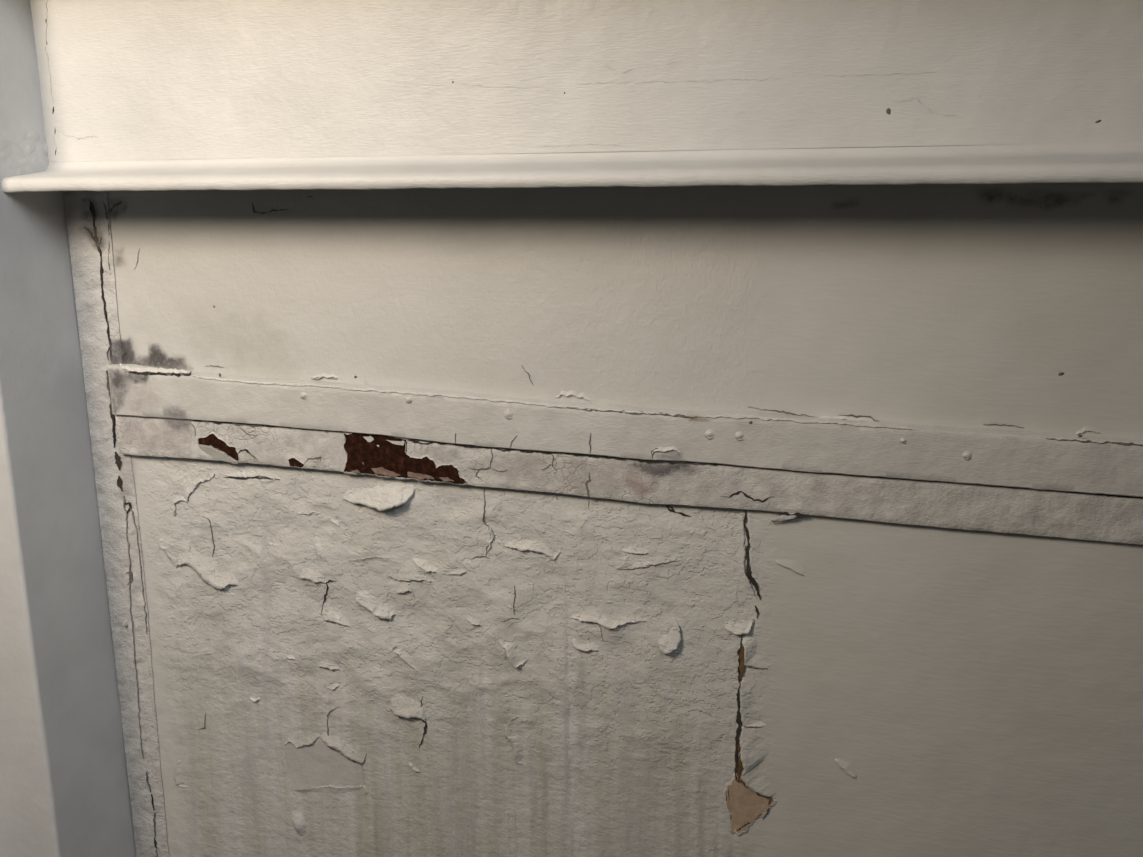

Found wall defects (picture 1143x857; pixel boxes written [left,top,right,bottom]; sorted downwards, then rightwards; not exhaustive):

corrosion [197,432,256,464]
corrosion [342,432,469,486]
peeling [173,469,280,516]
peeling [343,482,415,511]
crack [83,201,158,857]
peeling [158,516,238,589]
peeling [347,556,467,620]
peeling [571,611,648,652]
crack [721,491,769,780]
peeling [724,620,770,669]
peeling [284,707,368,794]
peeling [723,680,778,838]